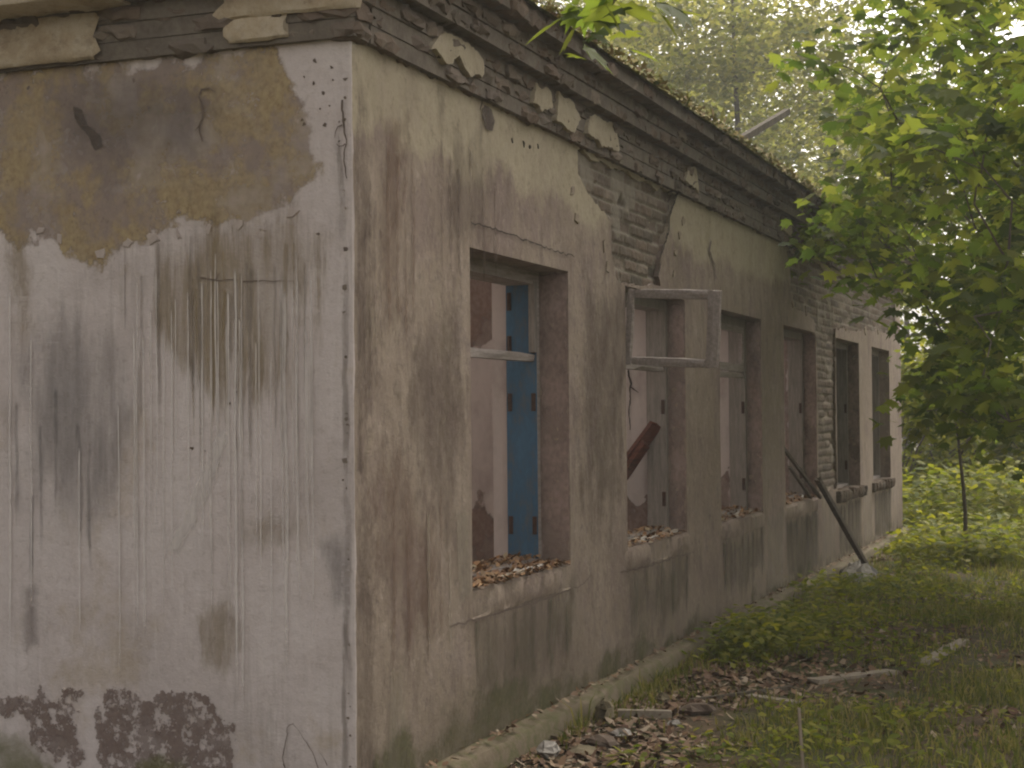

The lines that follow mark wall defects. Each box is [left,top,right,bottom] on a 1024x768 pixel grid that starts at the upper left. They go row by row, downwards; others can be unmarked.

peeling [0,46,317,268]
crack [334,100,347,179]
flaking render [480,101,495,131]
flaking render [570,150,672,286]
leakage [133,227,313,684]
flaking render [787,250,894,495]